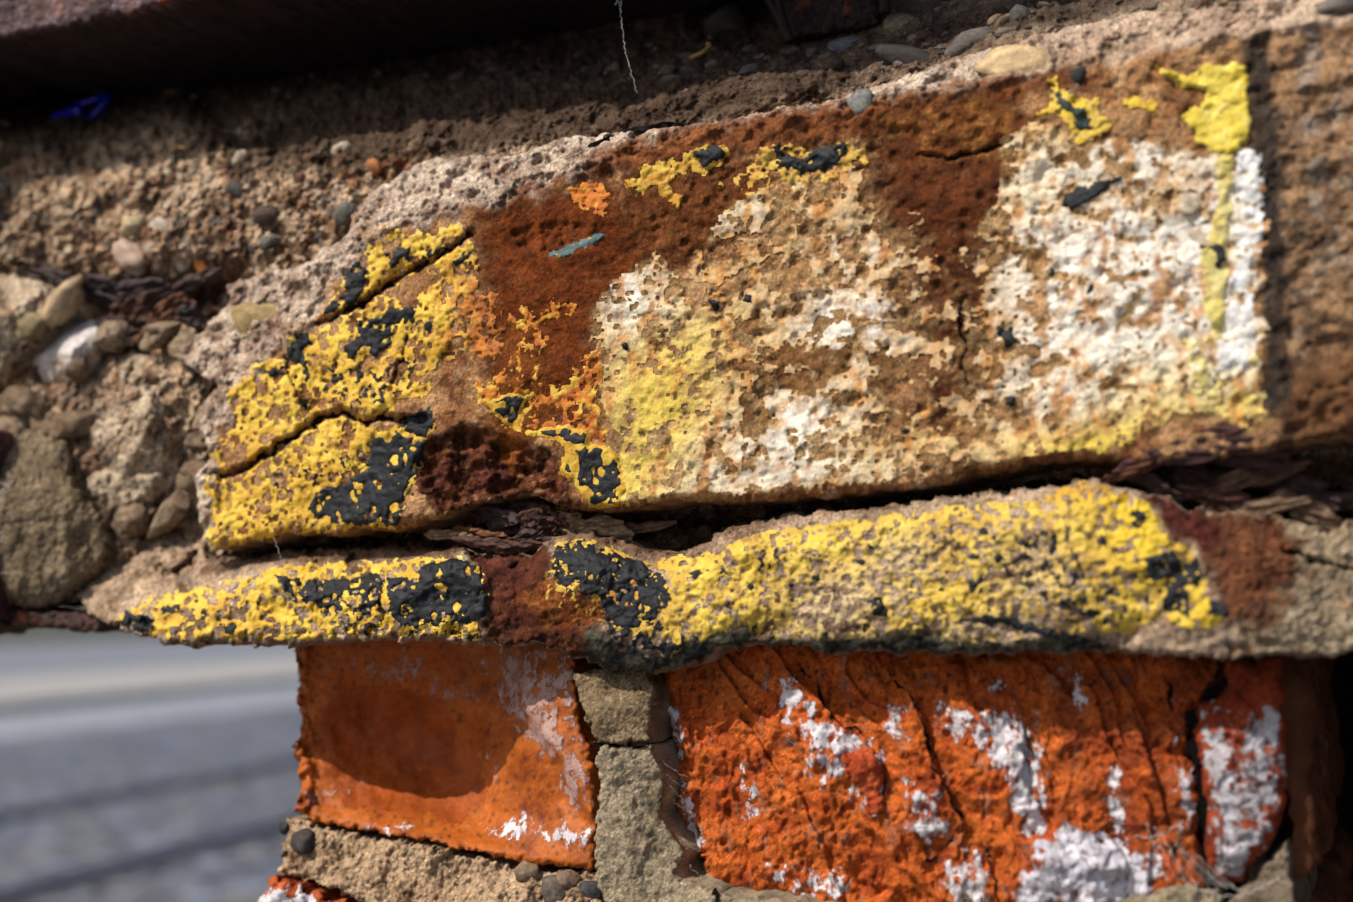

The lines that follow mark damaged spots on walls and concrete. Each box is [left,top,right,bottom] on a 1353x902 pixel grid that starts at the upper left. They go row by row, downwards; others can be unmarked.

crack [318,233,473,325]
crack [207,337,408,479]
leakage [583,624,1102,673]
leakage [480,645,595,845]
leakage [680,777,706,849]
leakage [740,764,760,819]
leakage [765,677,911,817]
leakage [903,779,949,845]
leakage [936,701,1165,902]
leakage [1173,699,1286,881]
leakage [258,884,316,902]
leakage [765,862,850,900]